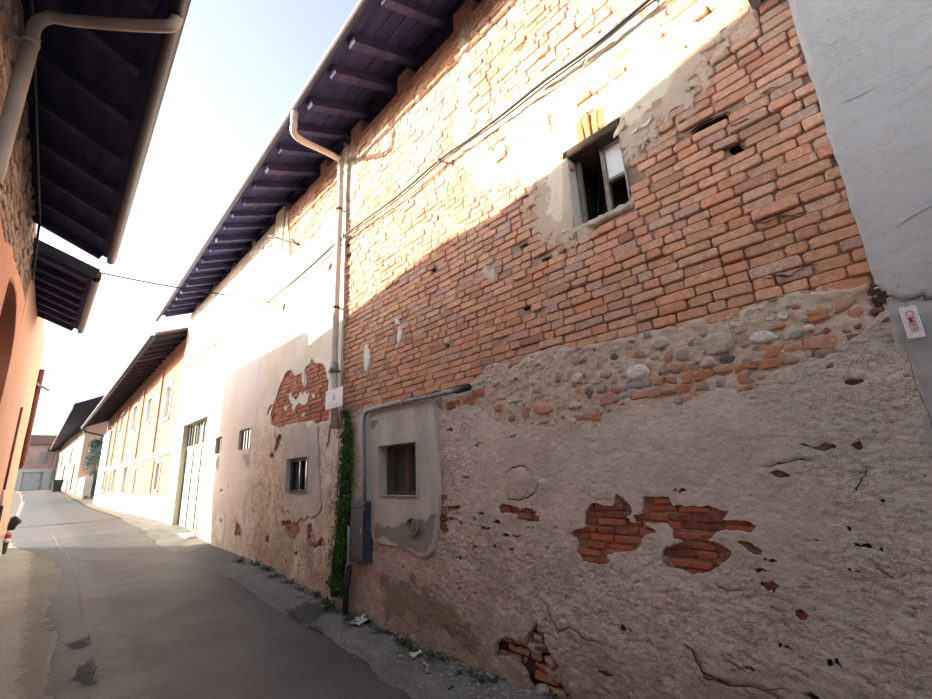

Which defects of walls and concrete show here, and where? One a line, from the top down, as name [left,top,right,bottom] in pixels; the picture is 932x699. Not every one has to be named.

flaking render [459,0,754,262]
flaking render [441,277,901,437]
flaking render [284,371,315,417]
flaking render [279,520,325,548]
flaking render [440,494,462,534]
flaking render [482,506,539,530]
flaking render [575,488,756,574]
spalling [499,624,569,699]
crack [680,645,784,699]